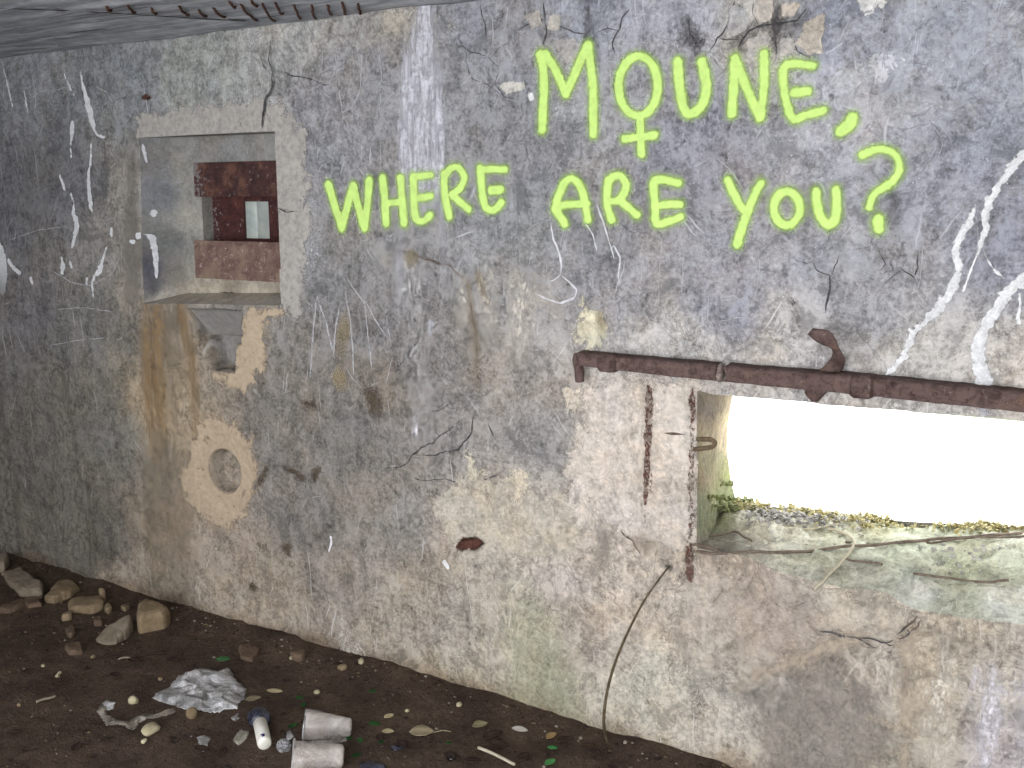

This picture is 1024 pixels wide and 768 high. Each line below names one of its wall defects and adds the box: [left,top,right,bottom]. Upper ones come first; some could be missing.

crack [689,1,807,67]
crack [259,40,328,126]
crack [796,257,839,310]
peeling [178,409,269,532]
crack [385,401,496,482]
corrosion [642,386,654,505]
corrosion [685,389,696,583]
crack [817,631,893,648]